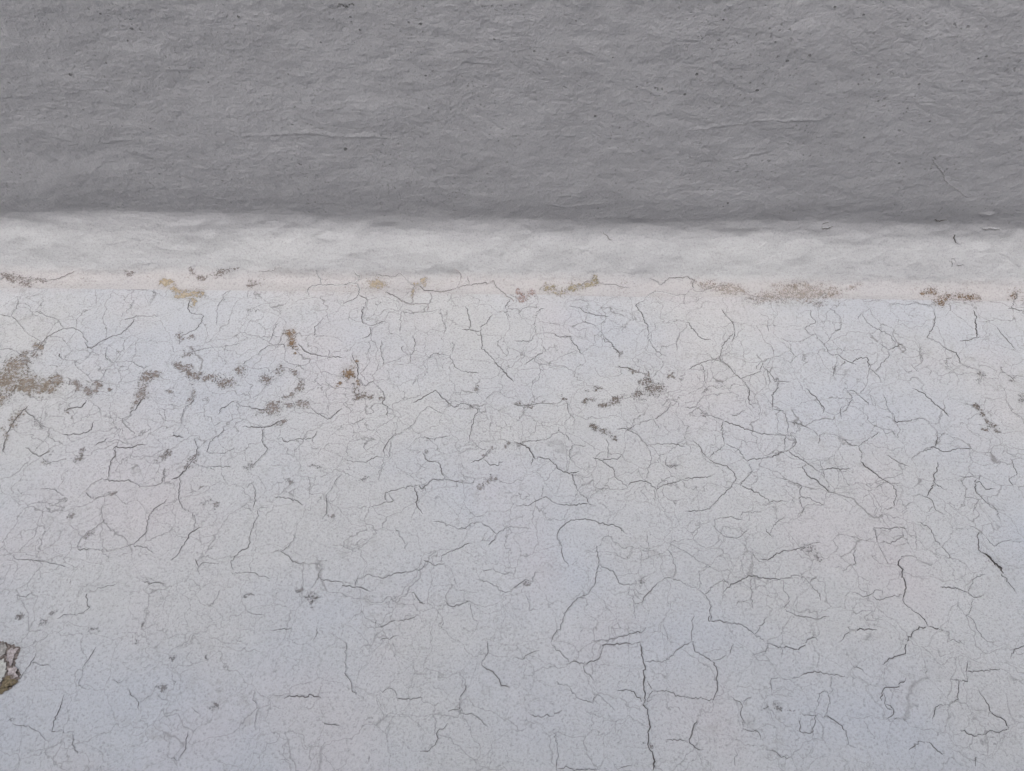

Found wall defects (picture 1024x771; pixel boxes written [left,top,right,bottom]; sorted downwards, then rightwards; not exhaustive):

spalling [0,641,21,695]
crack [0,266,1024,771]